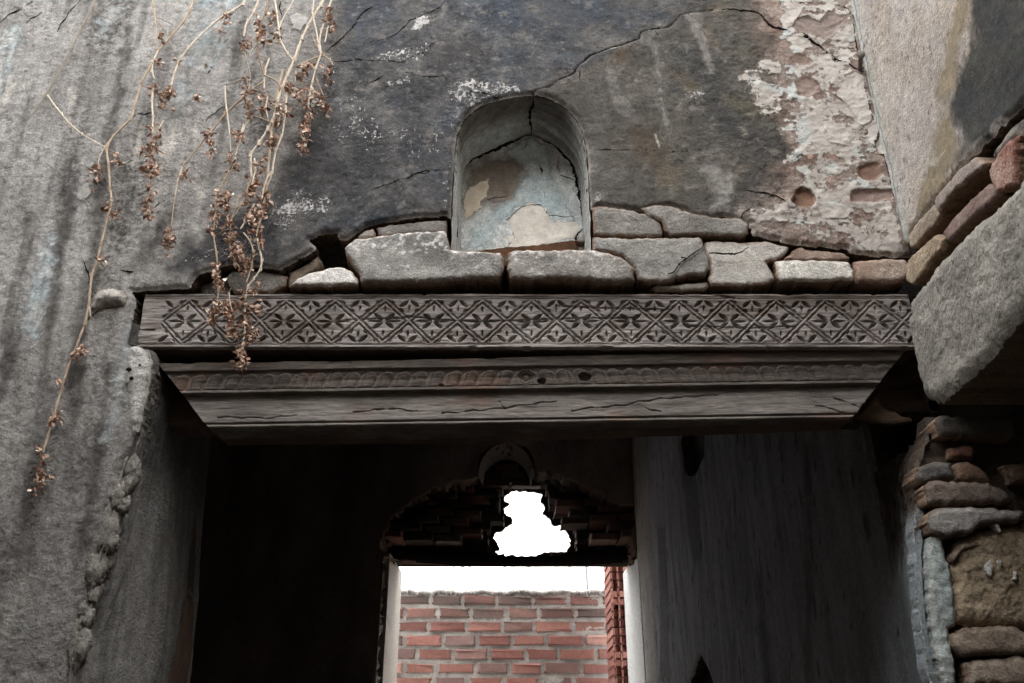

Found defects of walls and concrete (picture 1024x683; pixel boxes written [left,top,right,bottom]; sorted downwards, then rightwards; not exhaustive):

crack [326,2,499,98]
water stain [327,78,522,161]
crack [466,12,701,250]
crack [722,5,897,204]
crack [368,169,439,191]
peeling [463,178,489,219]
peeling [478,203,585,256]
spalling [737,0,1024,405]